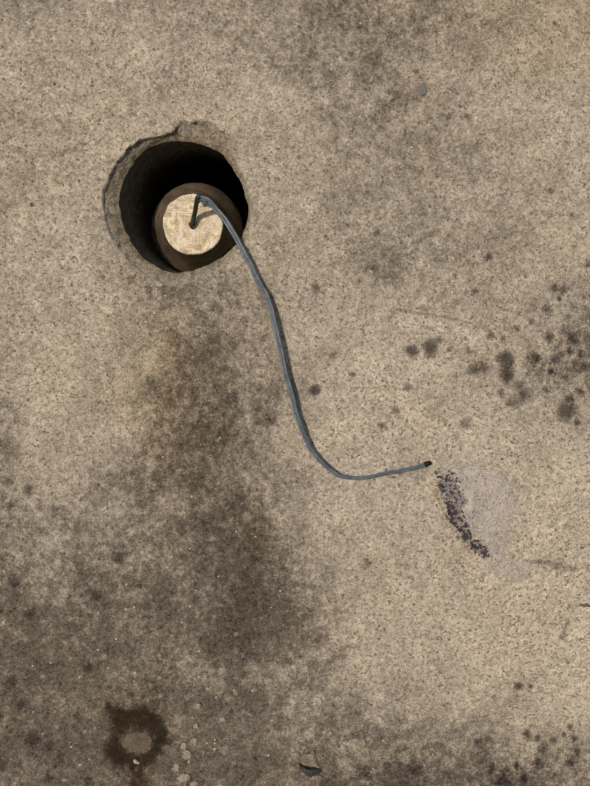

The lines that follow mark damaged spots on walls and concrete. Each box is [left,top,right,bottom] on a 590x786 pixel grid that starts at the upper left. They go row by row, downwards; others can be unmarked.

water stain [172,723,198,786]